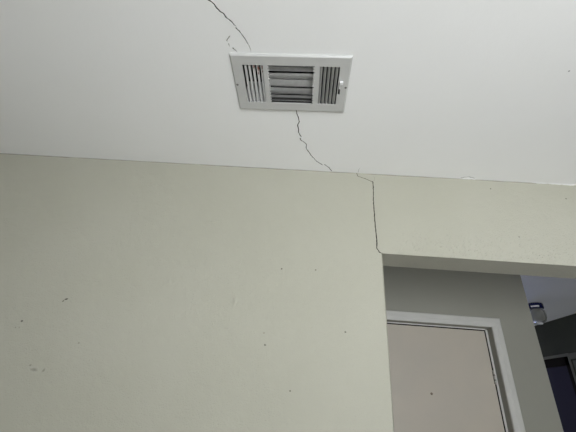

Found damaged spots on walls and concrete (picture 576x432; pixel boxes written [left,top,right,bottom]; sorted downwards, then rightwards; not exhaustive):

crack [206,0,251,52]
crack [0,153,185,164]
crack [210,110,454,253]